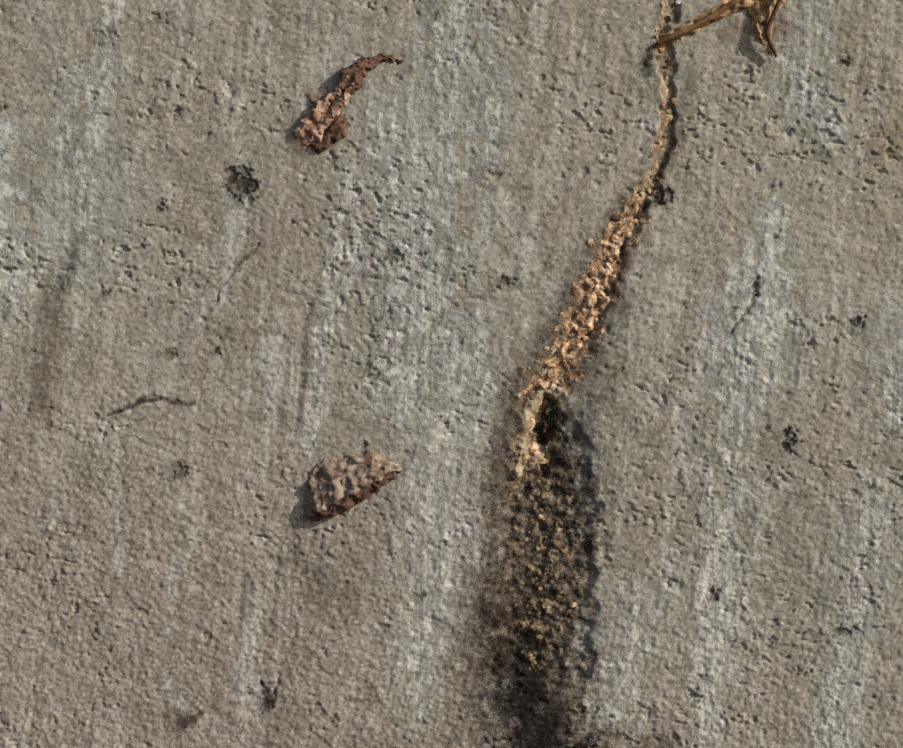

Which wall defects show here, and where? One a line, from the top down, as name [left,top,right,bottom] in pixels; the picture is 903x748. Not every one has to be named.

leakage [299,0,658,748]
crack [500,0,681,669]
leakage [677,194,807,747]
leakage [770,0,848,147]
leakage [805,472,901,748]
leakage [864,313,903,433]